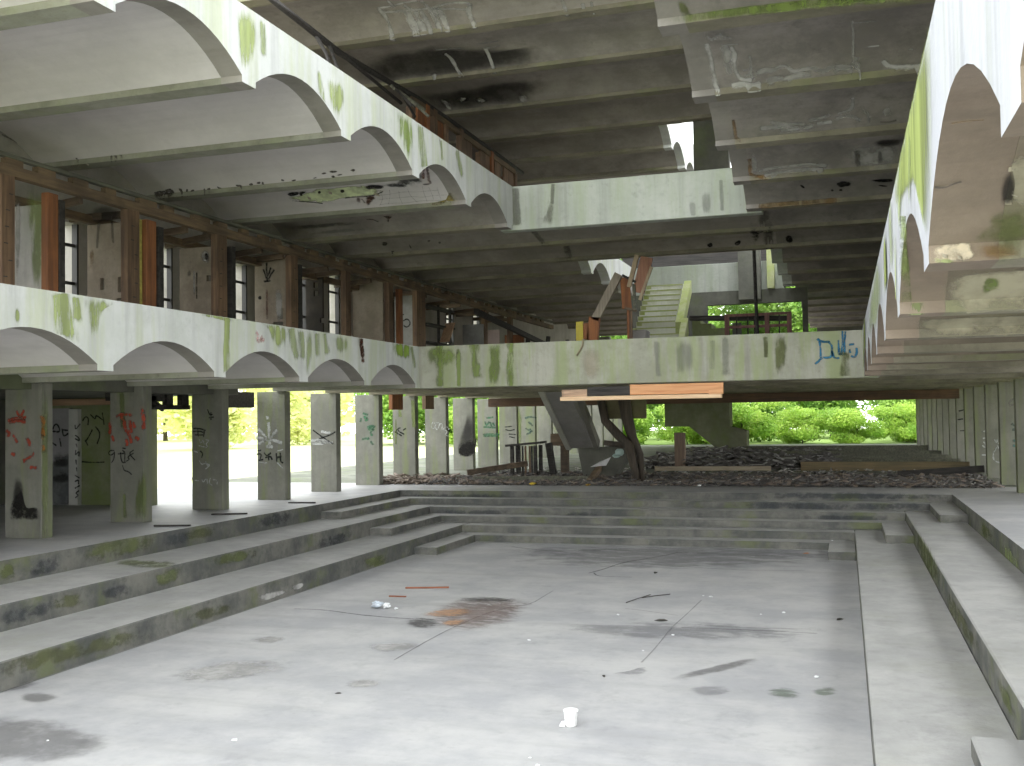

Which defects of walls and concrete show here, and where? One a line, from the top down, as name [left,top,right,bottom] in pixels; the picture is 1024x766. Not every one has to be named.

spalling [281,169,421,204]
leakage [1003,177,1013,202]
leakage [53,293,81,337]
leakage [456,345,480,386]
leakage [459,442,475,456]